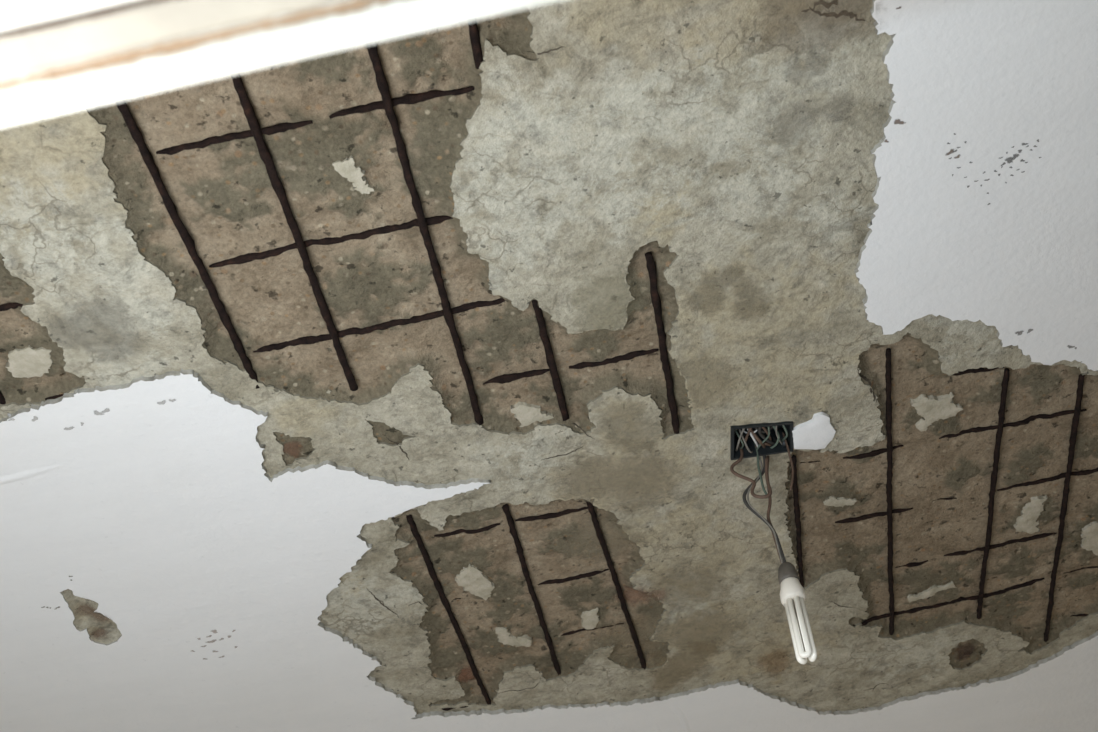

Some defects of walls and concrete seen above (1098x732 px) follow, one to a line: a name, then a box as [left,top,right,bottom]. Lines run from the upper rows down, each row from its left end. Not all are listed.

rust [0,0,392,88]
spalling [477,9,539,61]
spalling [0,253,86,406]
spalling [86,102,247,372]
spalling [125,76,478,427]
spalling [240,45,417,241]
spalling [377,22,694,439]
flaking render [60,589,122,645]
spalling [273,432,316,466]
spalling [389,499,643,707]
spalling [594,506,671,670]
spalling [754,332,1098,655]